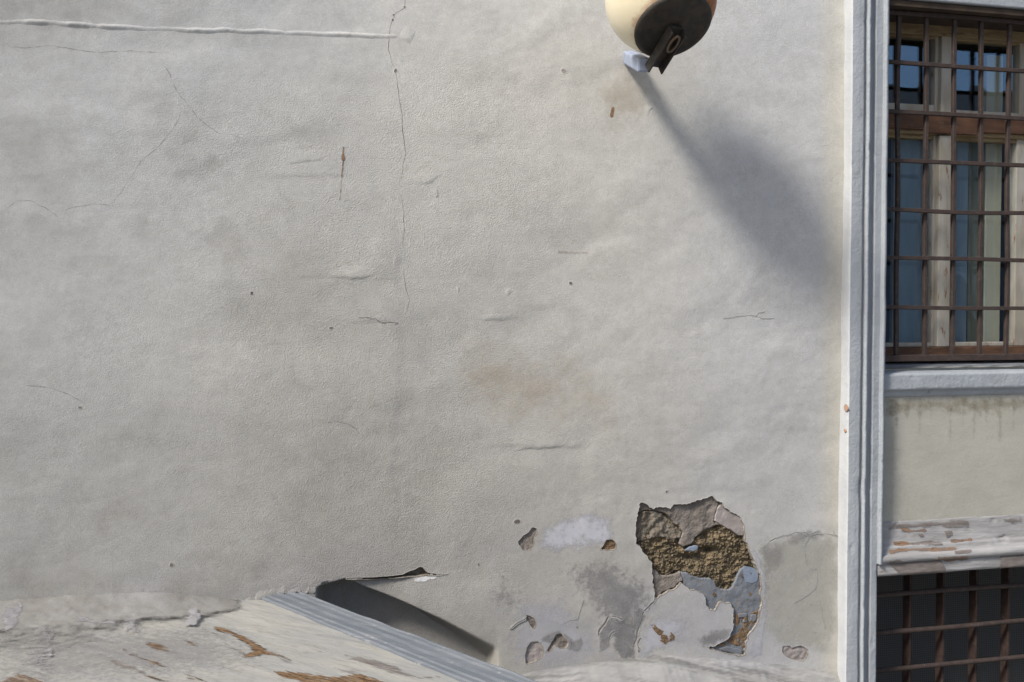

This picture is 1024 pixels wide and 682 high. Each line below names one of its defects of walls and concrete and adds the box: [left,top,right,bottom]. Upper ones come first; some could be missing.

crack [387,0,406,245]
peeling [512,518,537,551]
damp [541,514,613,550]
peeling [599,539,617,551]
flaking render [635,490,763,657]
peeling [889,527,972,575]
peeling [1000,555,1024,568]
peeling [525,615,582,664]
damp [573,566,681,658]
peeling [600,609,675,658]